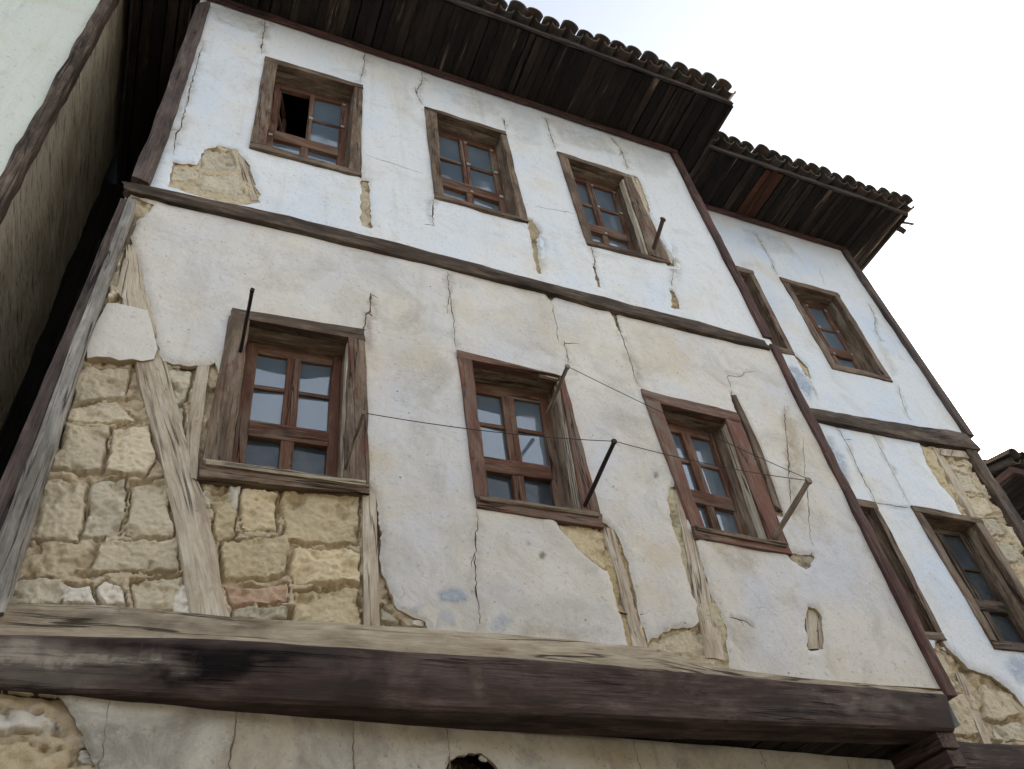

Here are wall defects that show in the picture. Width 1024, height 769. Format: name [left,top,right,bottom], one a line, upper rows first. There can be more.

crack [173,49,202,154]
spalling [169,145,260,205]
spalling [360,182,372,229]
spalling [528,220,540,274]
spalling [11,356,190,613]
spalling [197,365,363,625]
spalling [920,445,1024,586]
spalling [377,516,426,628]
crack [471,521,480,622]
spalling [558,488,728,668]
spalling [0,694,95,769]
spalling [933,643,1024,745]